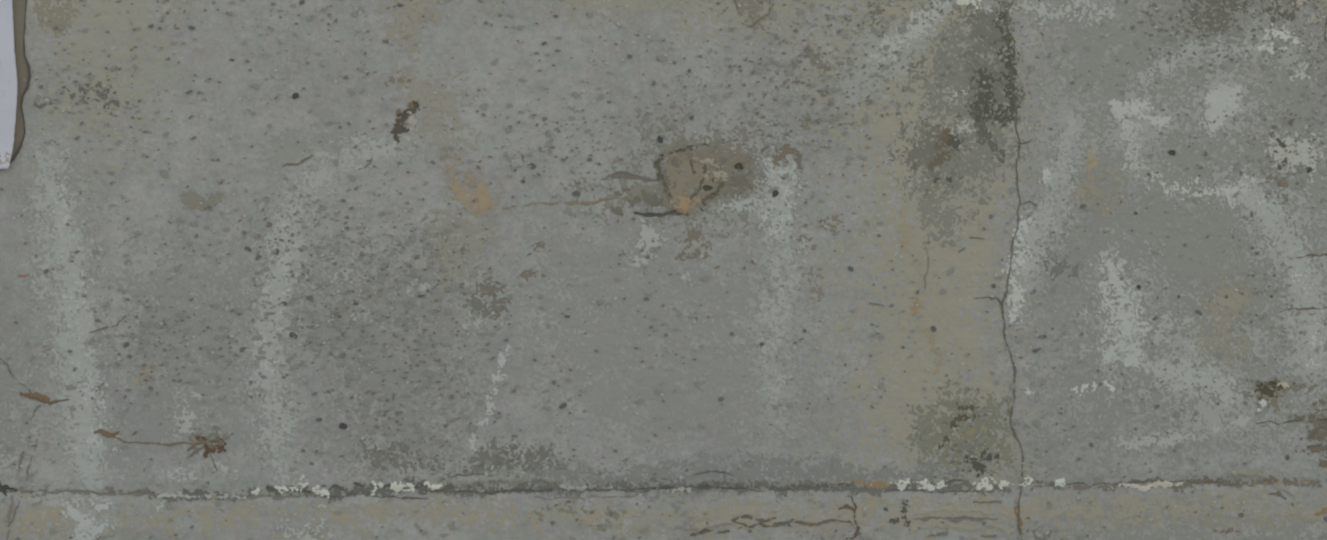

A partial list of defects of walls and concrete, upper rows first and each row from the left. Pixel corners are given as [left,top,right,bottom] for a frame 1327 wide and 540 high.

spalling [601,135,752,217]
crack [924,0,1252,535]
crack [0,358,974,540]